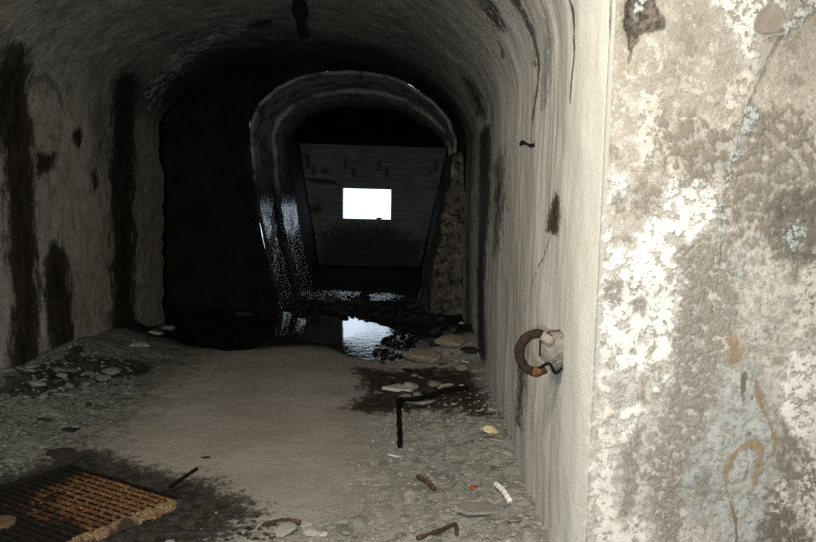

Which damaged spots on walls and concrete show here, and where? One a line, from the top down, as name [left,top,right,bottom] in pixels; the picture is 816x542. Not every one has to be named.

spalling [623,0,665,61]
peeling [711,0,787,142]
water stain [0,30,154,399]
water stain [89,19,271,328]
water stain [654,98,816,282]
water stain [679,358,816,542]